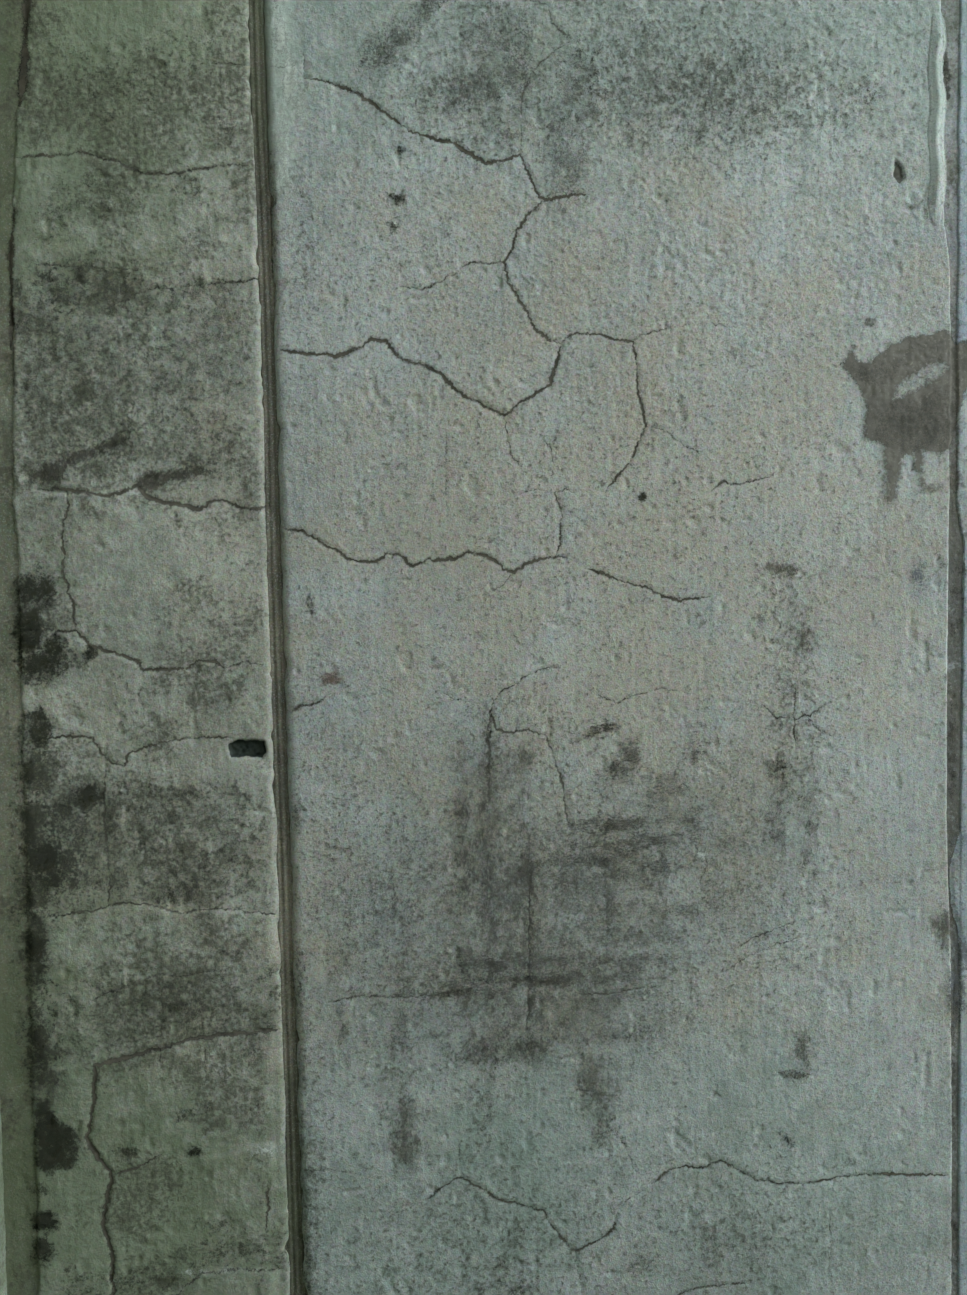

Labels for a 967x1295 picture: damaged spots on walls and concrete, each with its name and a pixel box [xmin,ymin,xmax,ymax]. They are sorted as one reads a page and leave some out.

crack [6,0,718,697]
damp [840,329,967,511]
mould [6,563,103,686]
crack [44,734,275,918]
crack [292,686,348,712]
crack [446,667,677,821]
damp [7,705,283,1266]
damp [311,695,800,1143]
damp [62,1218,290,1295]
crack [84,971,281,1295]
damp [380,1089,426,1170]
crack [365,1128,945,1279]